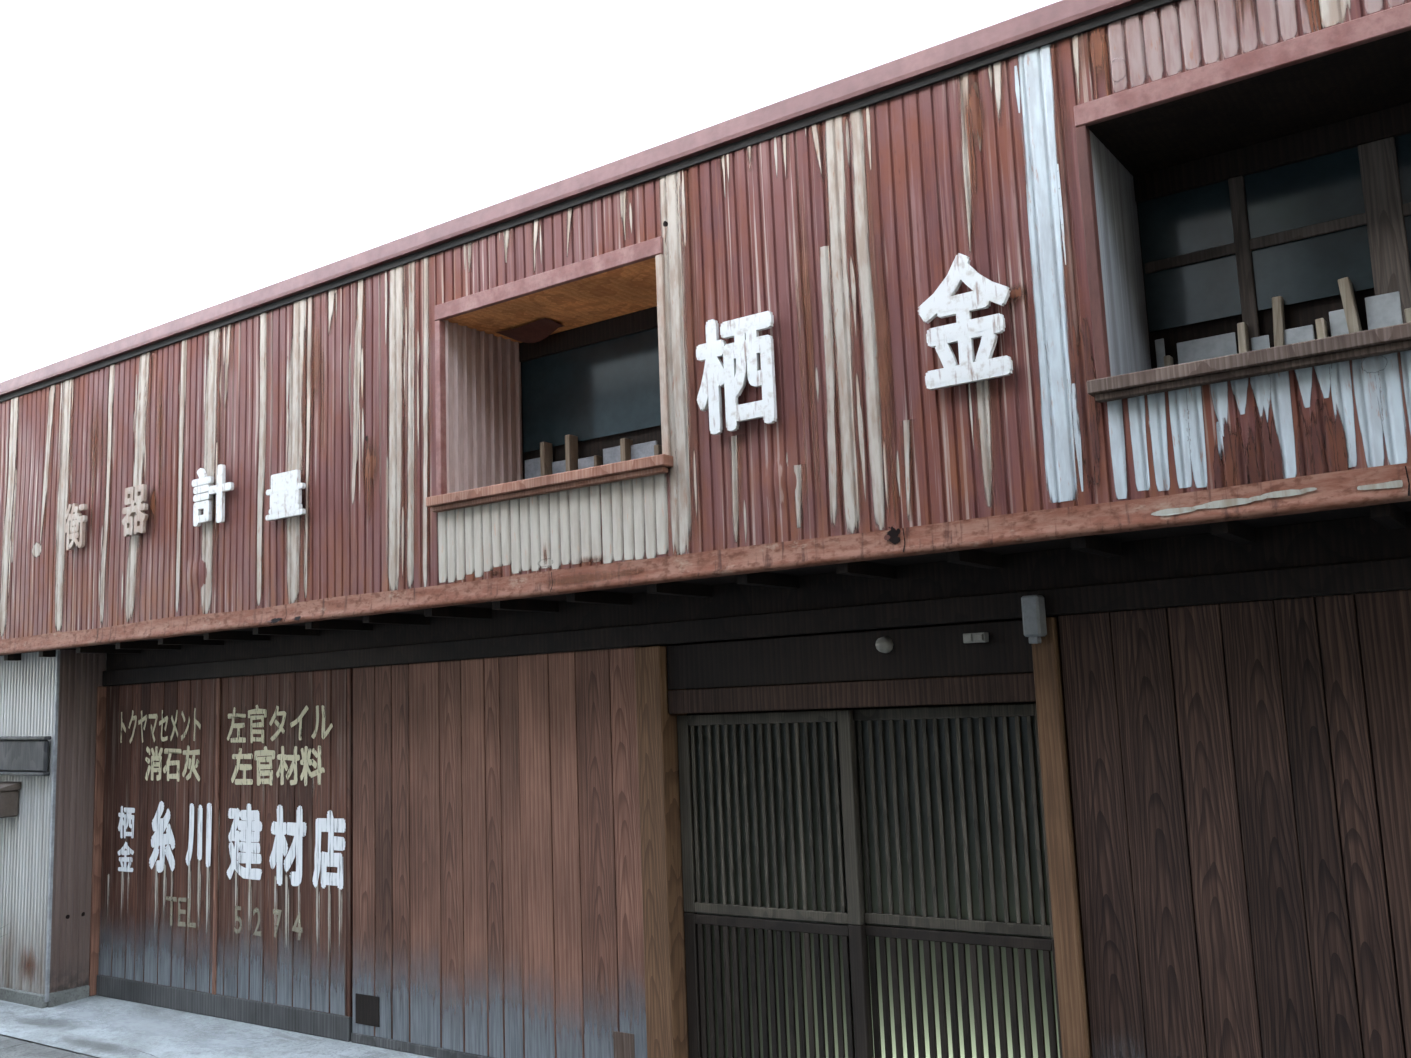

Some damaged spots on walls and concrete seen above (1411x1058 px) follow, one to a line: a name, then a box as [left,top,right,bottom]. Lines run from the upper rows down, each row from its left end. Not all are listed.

rust [1086,26,1111,99]
peeling [1108,0,1404,92]
rust [1304,0,1322,33]
rust [964,78,984,190]
rust [1008,285,1027,309]
rust [90,419,103,527]
rust [150,397,163,534]
rust [310,335,323,446]
rust [363,442,377,520]
rust [879,313,895,508]
rust [1072,318,1100,488]
peeling [1107,350,1411,516]